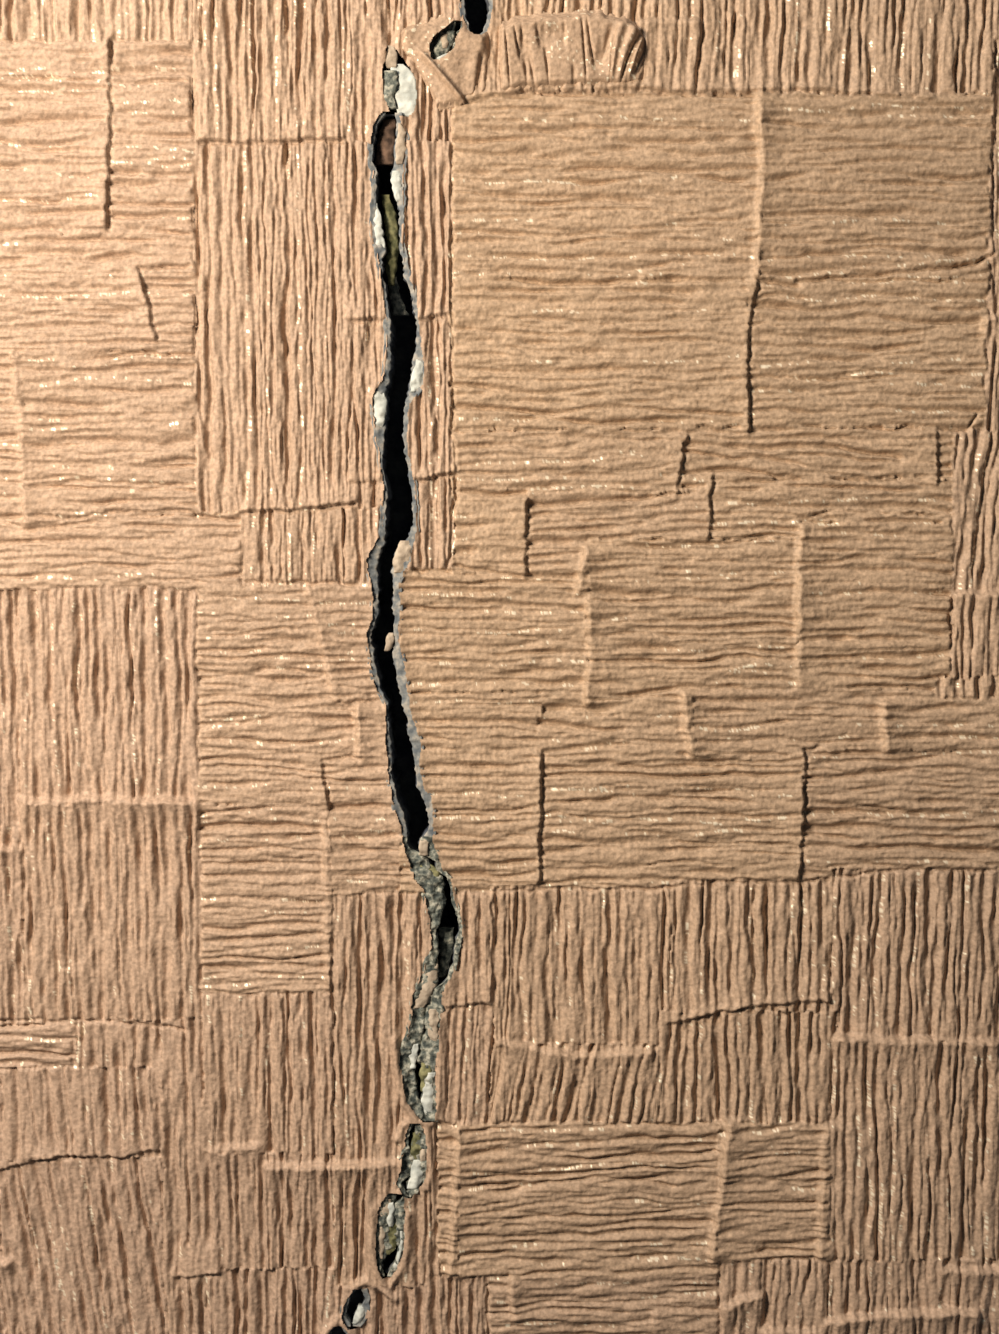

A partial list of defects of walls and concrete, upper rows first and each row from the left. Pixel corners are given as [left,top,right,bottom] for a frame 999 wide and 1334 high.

crack [429,0,493,59]
crack [329,112,466,1334]